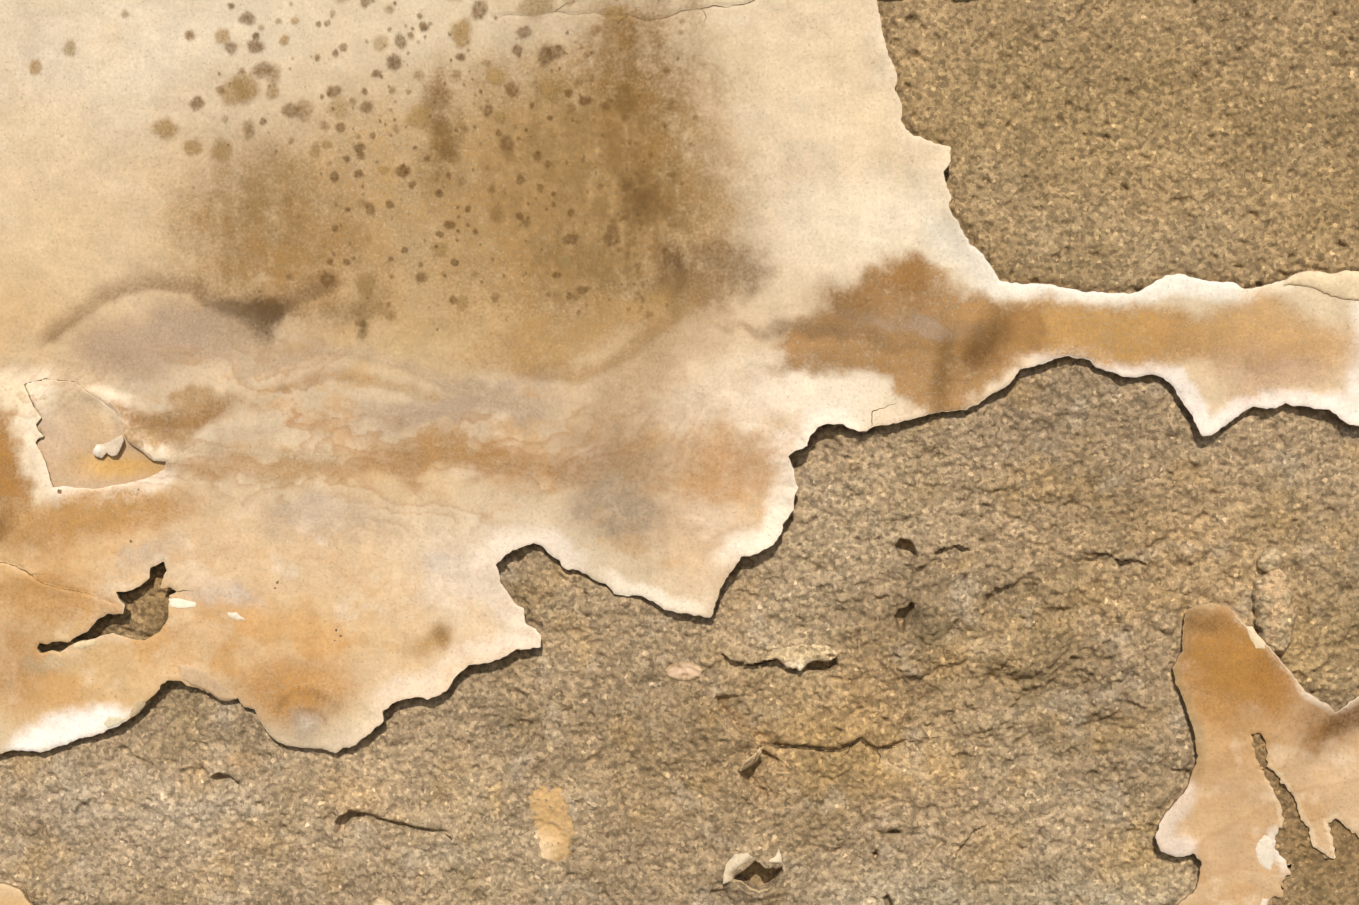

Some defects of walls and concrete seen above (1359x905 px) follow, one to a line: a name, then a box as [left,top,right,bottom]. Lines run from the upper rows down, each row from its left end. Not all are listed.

water stain [229,3,261,50]
water stain [373,14,428,78]
water stain [448,2,496,61]
water stain [100,31,756,374]
peeling [877,0,1359,300]
water stain [0,419,168,540]
water stain [117,387,221,454]
peeling [0,356,1359,905]